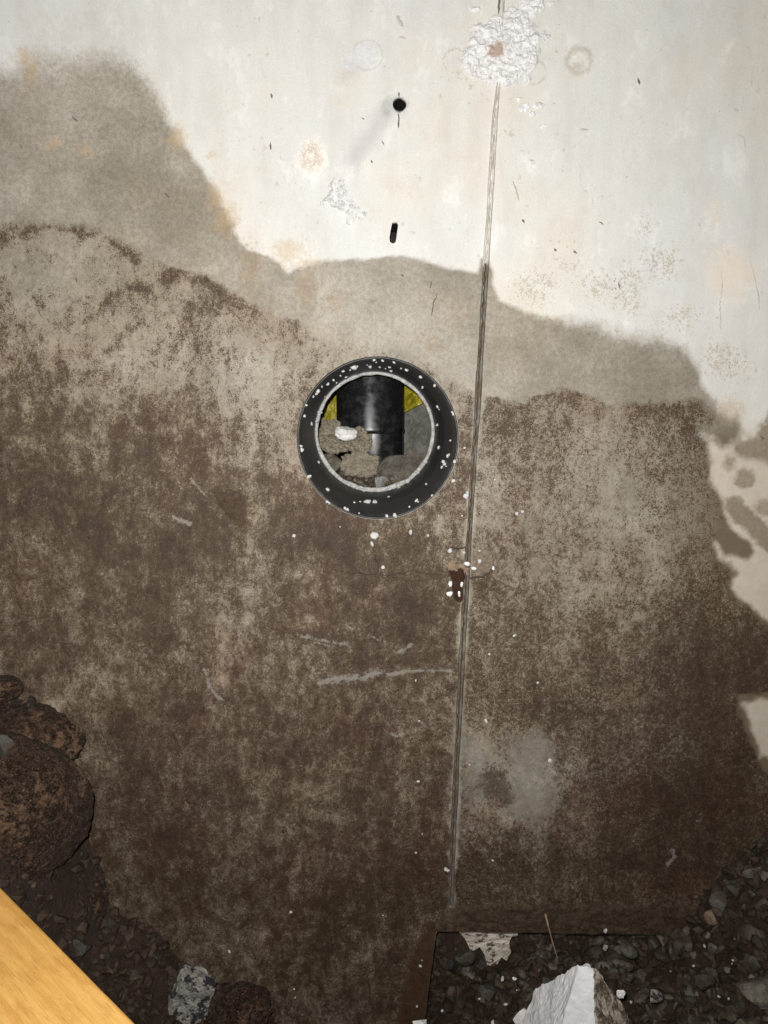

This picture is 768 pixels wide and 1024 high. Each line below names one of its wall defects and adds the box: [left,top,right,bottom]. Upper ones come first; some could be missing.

leakage [45,665,126,711]
leakage [0,57,483,568]
leakage [204,535,316,682]
crack [344,81,525,905]
leakage [423,266,768,914]